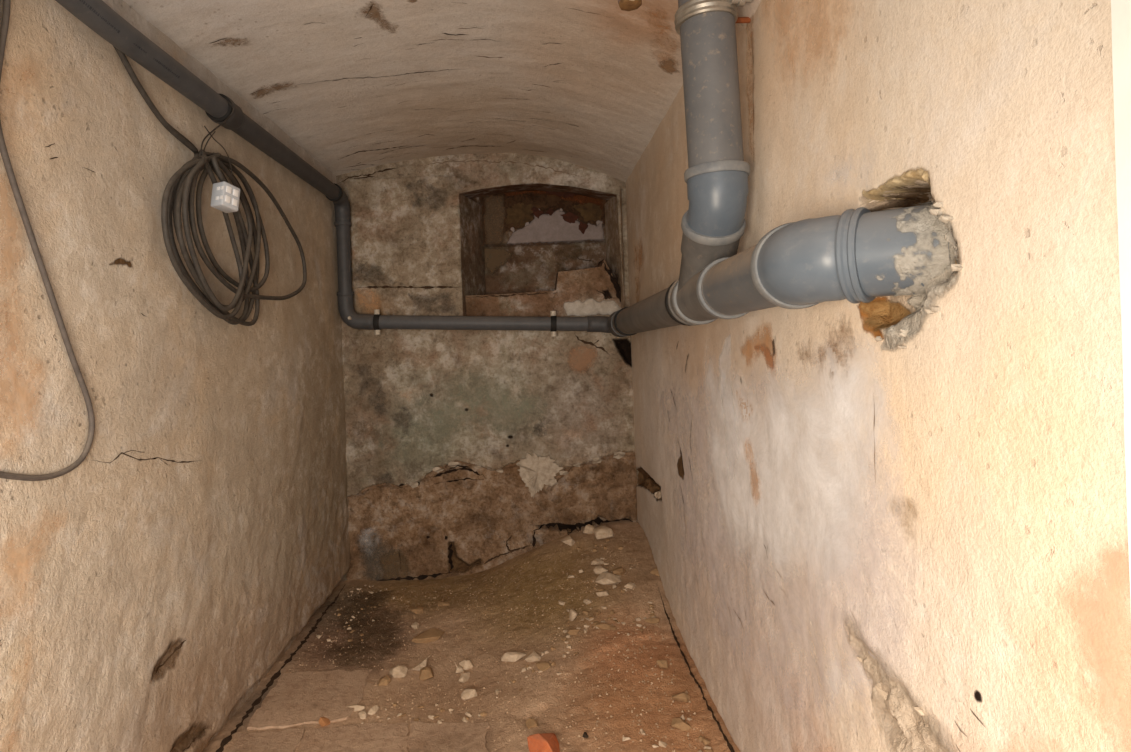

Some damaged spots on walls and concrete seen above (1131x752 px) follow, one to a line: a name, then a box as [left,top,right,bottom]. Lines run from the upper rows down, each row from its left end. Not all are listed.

spalling [479,191,608,245]
spalling [564,289,622,316]
spalling [858,168,963,350]
crack [91,450,202,464]
spalling [346,451,662,580]
spalling [846,622,949,752]